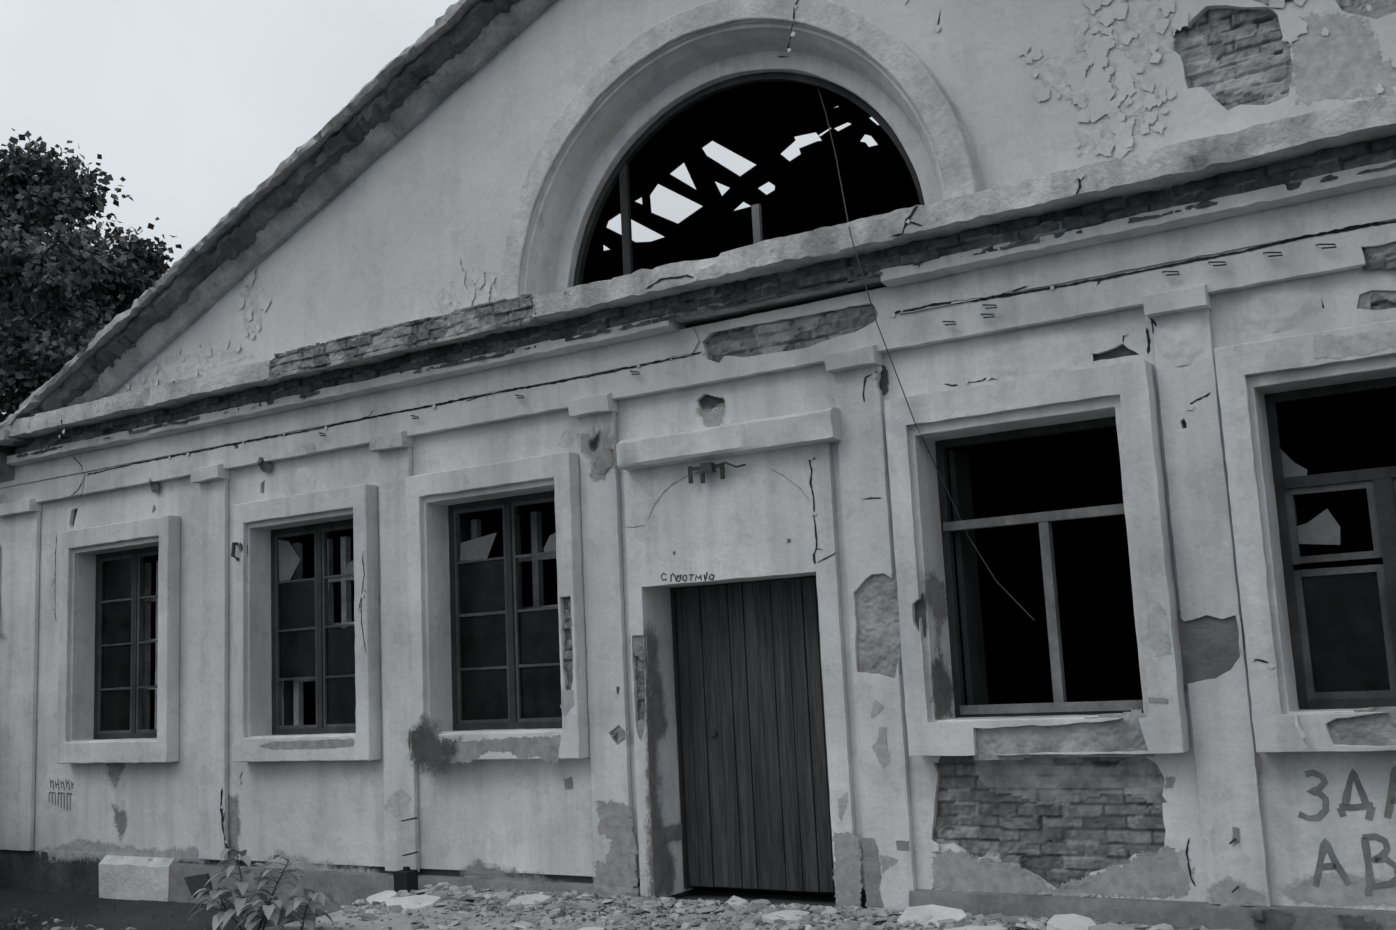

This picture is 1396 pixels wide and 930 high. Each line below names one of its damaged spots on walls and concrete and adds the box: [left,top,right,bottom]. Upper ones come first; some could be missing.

spalling [1018,0,1396,159]
spalling [15,135,1396,457]
crack [629,472,699,528]
crack [771,454,836,563]
spalling [560,597,579,716]
spalling [855,573,927,679]
spalling [1177,610,1246,690]
peeling [442,735,561,764]
peeling [590,800,640,896]
spalling [929,709,1196,900]